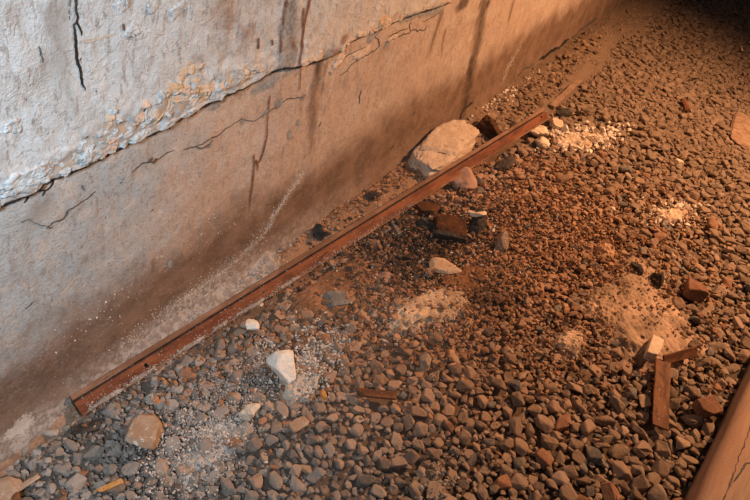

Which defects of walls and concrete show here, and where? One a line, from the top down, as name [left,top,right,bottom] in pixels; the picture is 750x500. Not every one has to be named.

spalling [0,60,264,208]
crack [4,0,449,229]
corrosion [249,96,271,208]
corrosion [272,0,311,87]
damp [121,171,306,355]
damp [1,414,41,443]